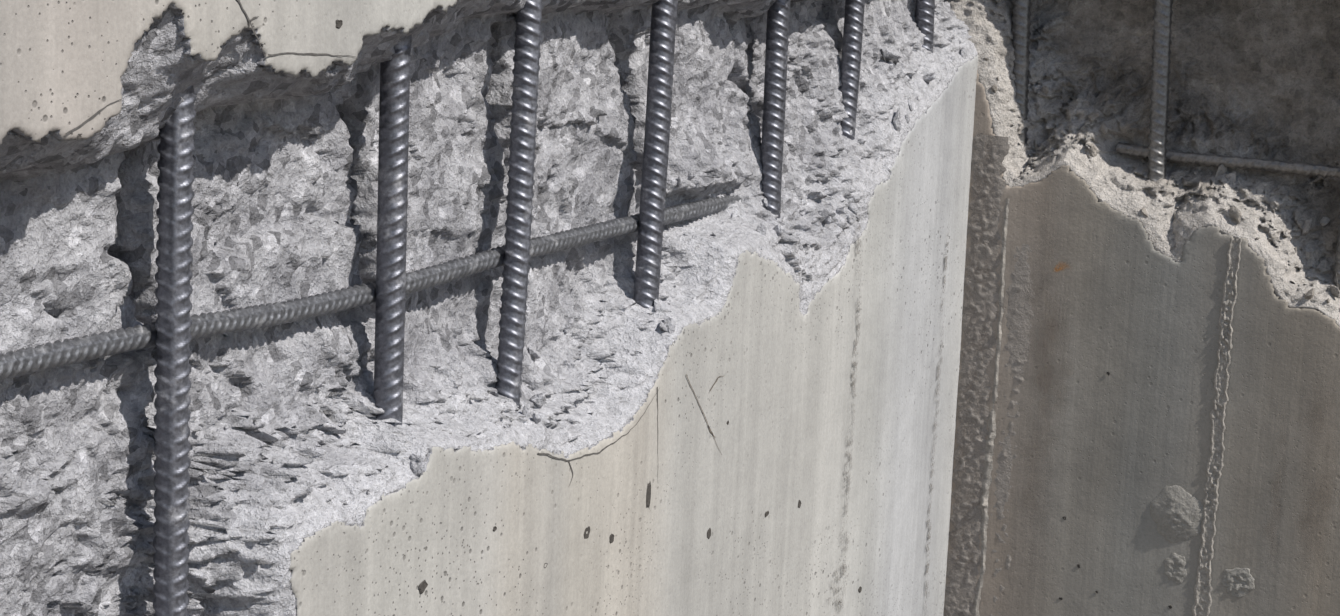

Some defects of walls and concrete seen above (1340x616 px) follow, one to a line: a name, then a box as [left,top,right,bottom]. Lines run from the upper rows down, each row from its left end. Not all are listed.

spalling [0,0,977,616]
spalling [945,0,1340,327]